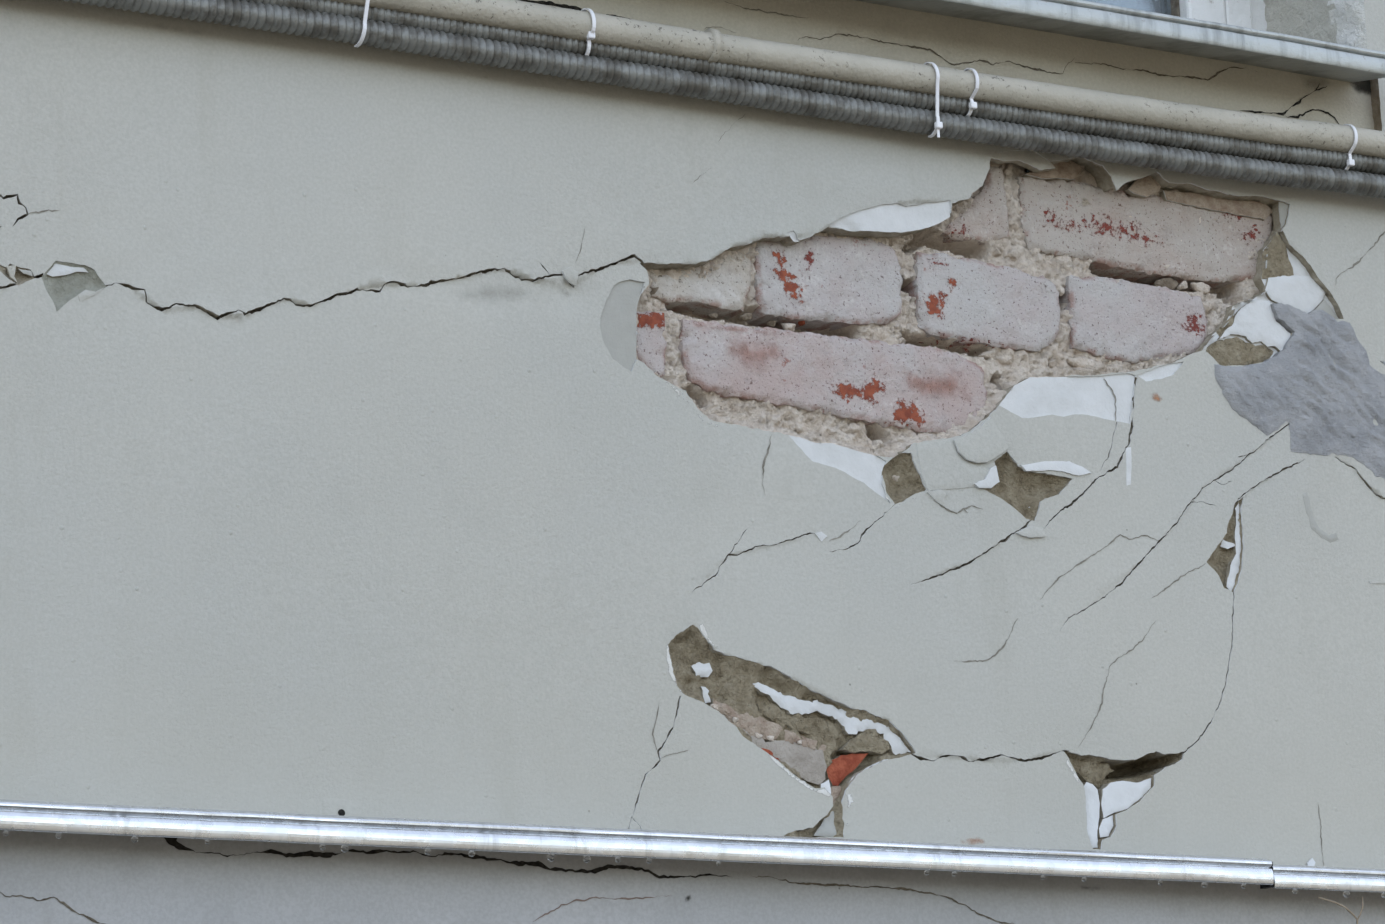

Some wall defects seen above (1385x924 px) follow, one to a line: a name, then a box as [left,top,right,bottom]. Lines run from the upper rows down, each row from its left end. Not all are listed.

crack [1240,85,1339,124]
crack [0,194,59,228]
crack [106,229,644,320]
spalling [600,150,1344,538]
crack [913,377,1137,584]
crack [692,504,895,593]
crack [912,425,1385,762]
spalling [1207,498,1244,592]
crack [628,696,688,830]
spalling [666,624,916,838]
spalling [1065,751,1184,850]
crack [196,849,1014,924]